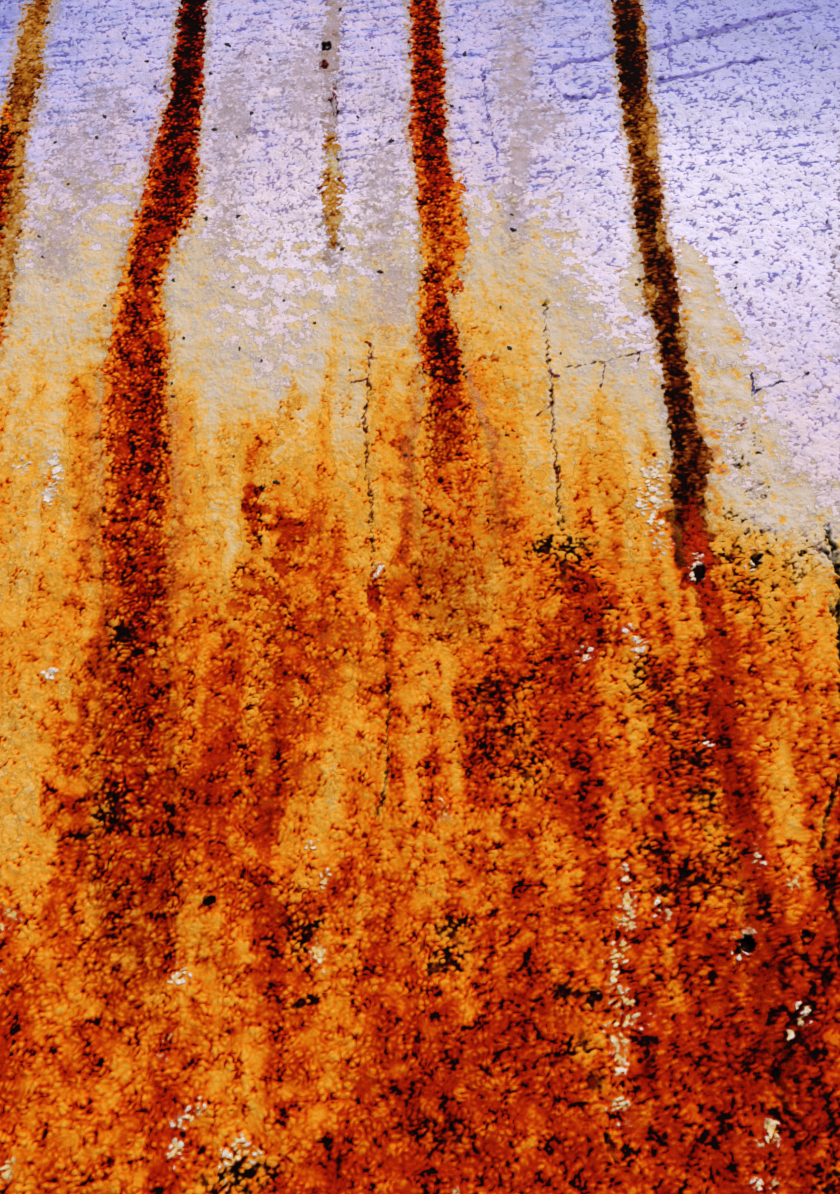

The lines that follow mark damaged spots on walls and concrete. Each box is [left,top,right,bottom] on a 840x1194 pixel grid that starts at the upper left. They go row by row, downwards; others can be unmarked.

corrosion [266,238,287,260]
corrosion [626,328,649,344]
corrosion [741,354,782,413]
corrosion [738,951,761,974]
corrosion [714,965,728,984]